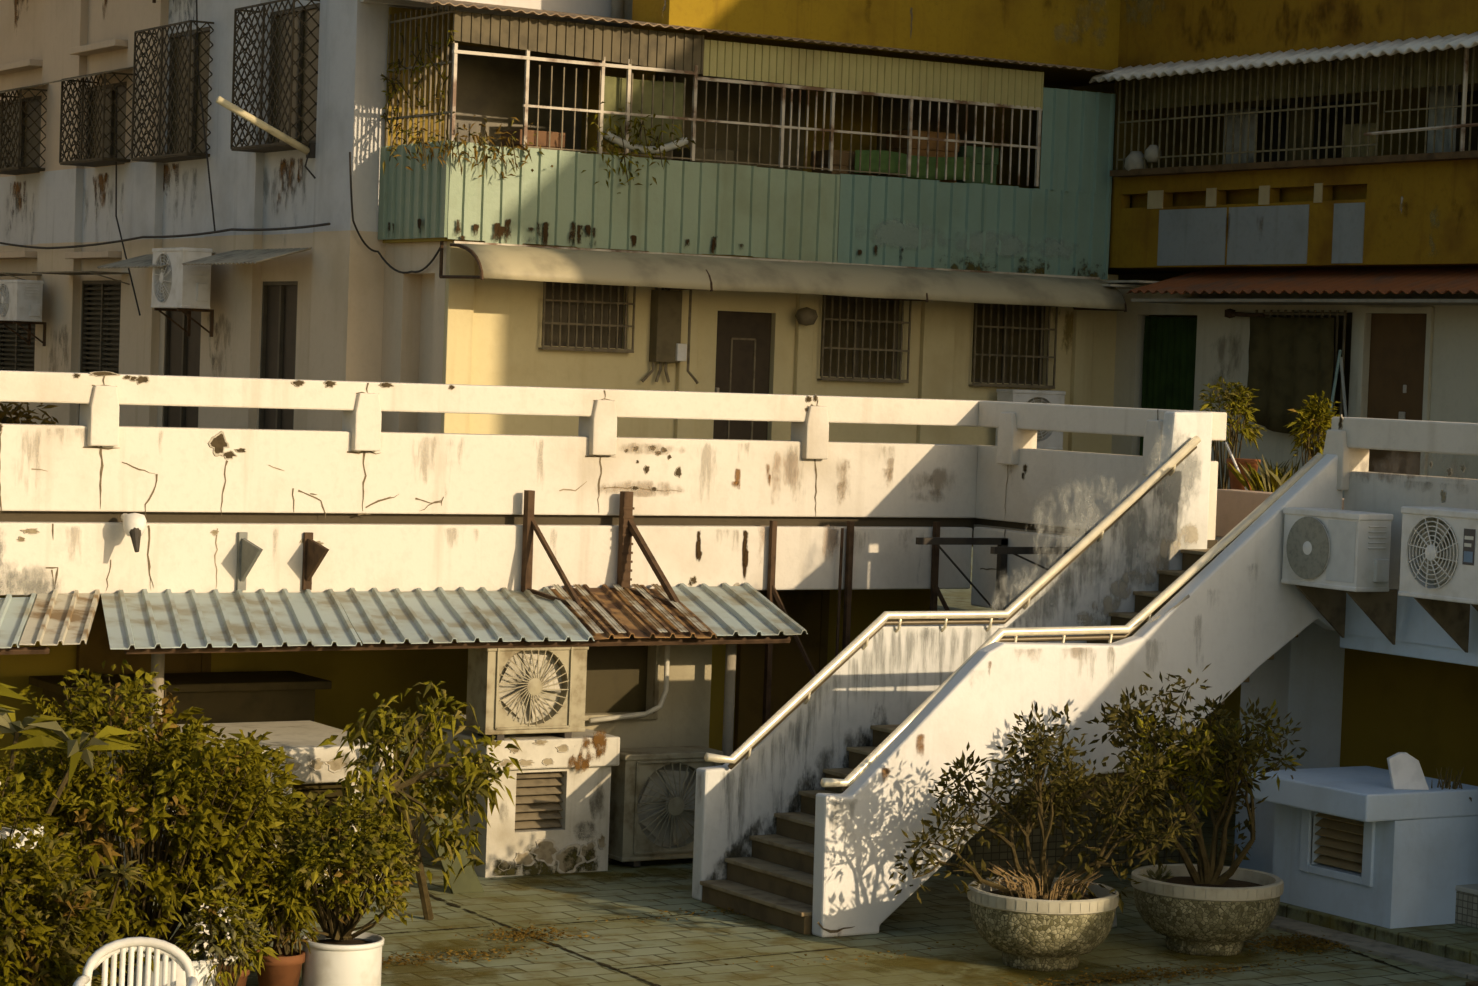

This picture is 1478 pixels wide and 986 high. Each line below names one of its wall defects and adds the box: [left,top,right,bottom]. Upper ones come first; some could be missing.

rust [93,173,108,206]
rust [277,158,303,203]
rust [455,219,549,246]
rust [569,222,596,247]
spalling [208,431,247,459]
crack [269,451,444,518]
crack [83,446,158,588]
crack [214,460,228,587]
peeling [498,739,569,768]
spalling [498,833,606,873]